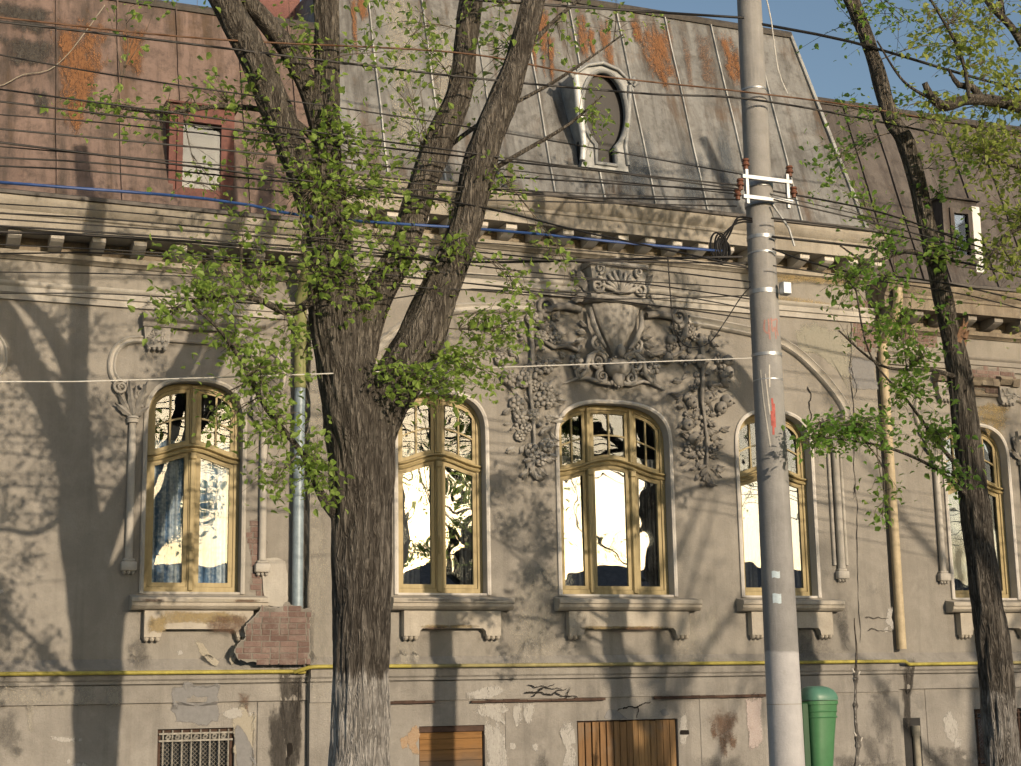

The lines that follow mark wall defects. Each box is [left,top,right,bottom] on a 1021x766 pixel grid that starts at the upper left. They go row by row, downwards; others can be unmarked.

corrosion [57,18,108,135]
corrosion [532,11,554,81]
corrosion [631,22,740,86]
flaking render [223,703,257,766]
leakage [269,665,303,766]
flaking render [400,725,420,755]
flaking render [467,686,535,766]
crack [525,684,578,698]
flaking render [560,722,576,766]